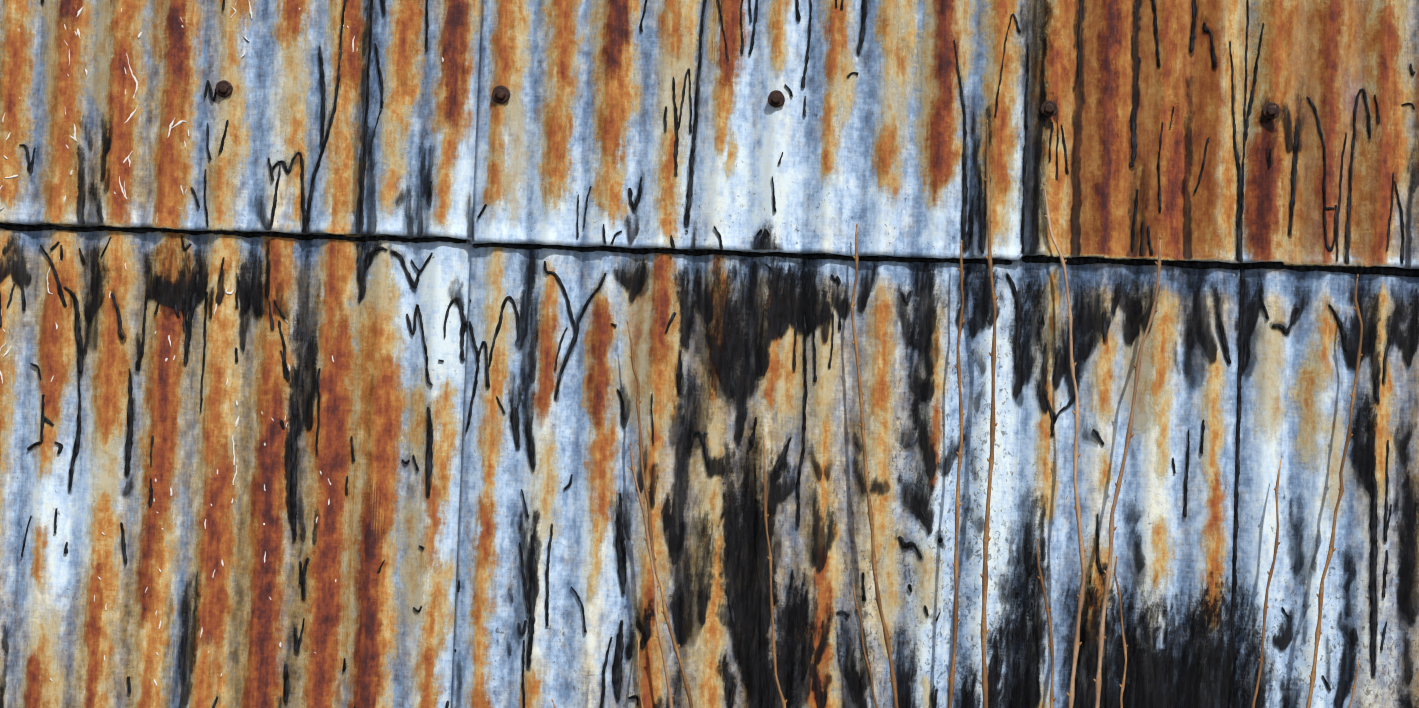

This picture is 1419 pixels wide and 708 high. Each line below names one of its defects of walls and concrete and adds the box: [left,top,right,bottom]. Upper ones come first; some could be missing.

corrosion [379,0,641,227]
corrosion [821,0,856,181]
corrosion [0,0,513,708]
water stain [478,296,520,387]
water stain [554,273,607,398]
corrosion [764,294,843,708]
water stain [793,311,842,526]
water stain [1006,273,1021,370]
water stain [1044,393,1075,436]
corrosion [873,0,1419,520]
corrosion [1201,350,1226,627]
water stain [1368,470,1392,676]